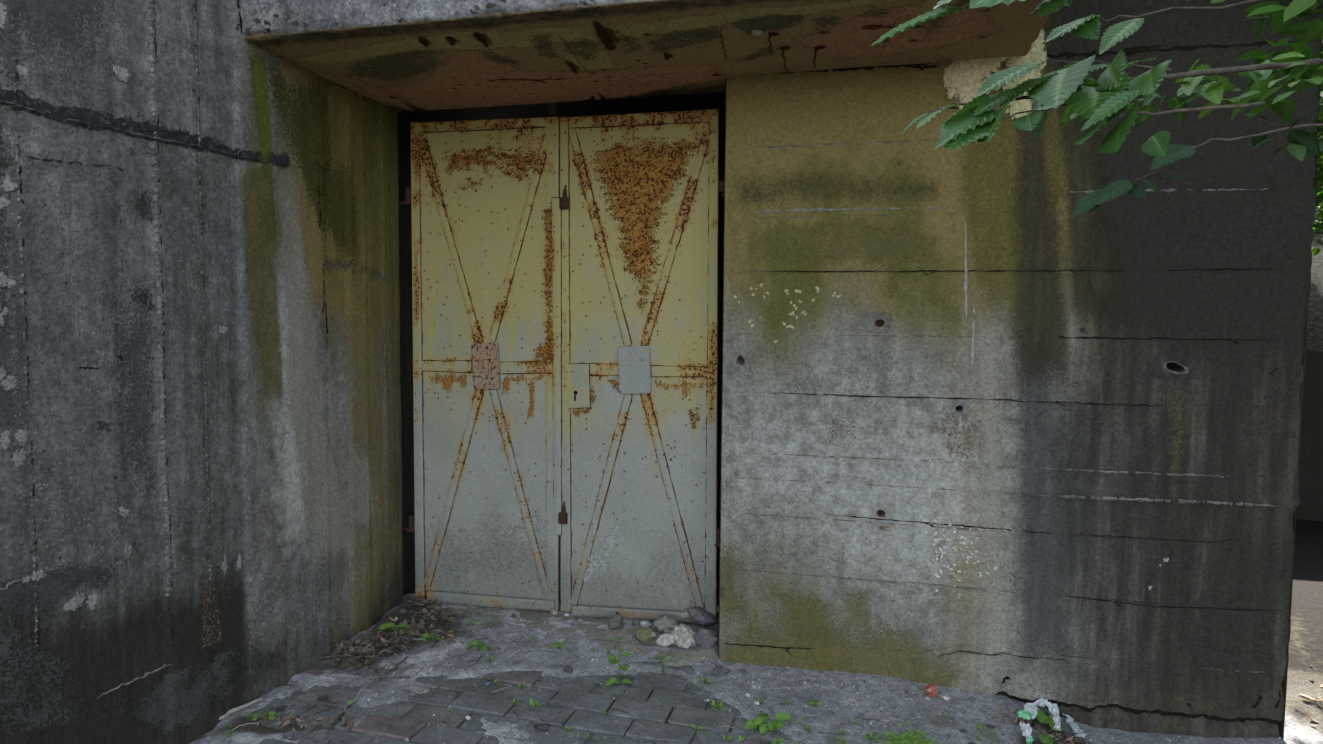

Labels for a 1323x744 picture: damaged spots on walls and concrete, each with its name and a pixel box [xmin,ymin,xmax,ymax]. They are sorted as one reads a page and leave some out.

water stain [0,0,121,100]
water stain [0,110,38,457]
water stain [97,257,173,506]
water stain [262,161,374,566]
rust [429,373,467,392]
rust [441,141,539,192]
rust [500,203,553,418]
rust [572,387,596,418]
rust [590,135,701,312]
rust [655,379,704,429]
water stain [318,0,1124,663]
water stain [0,557,287,740]